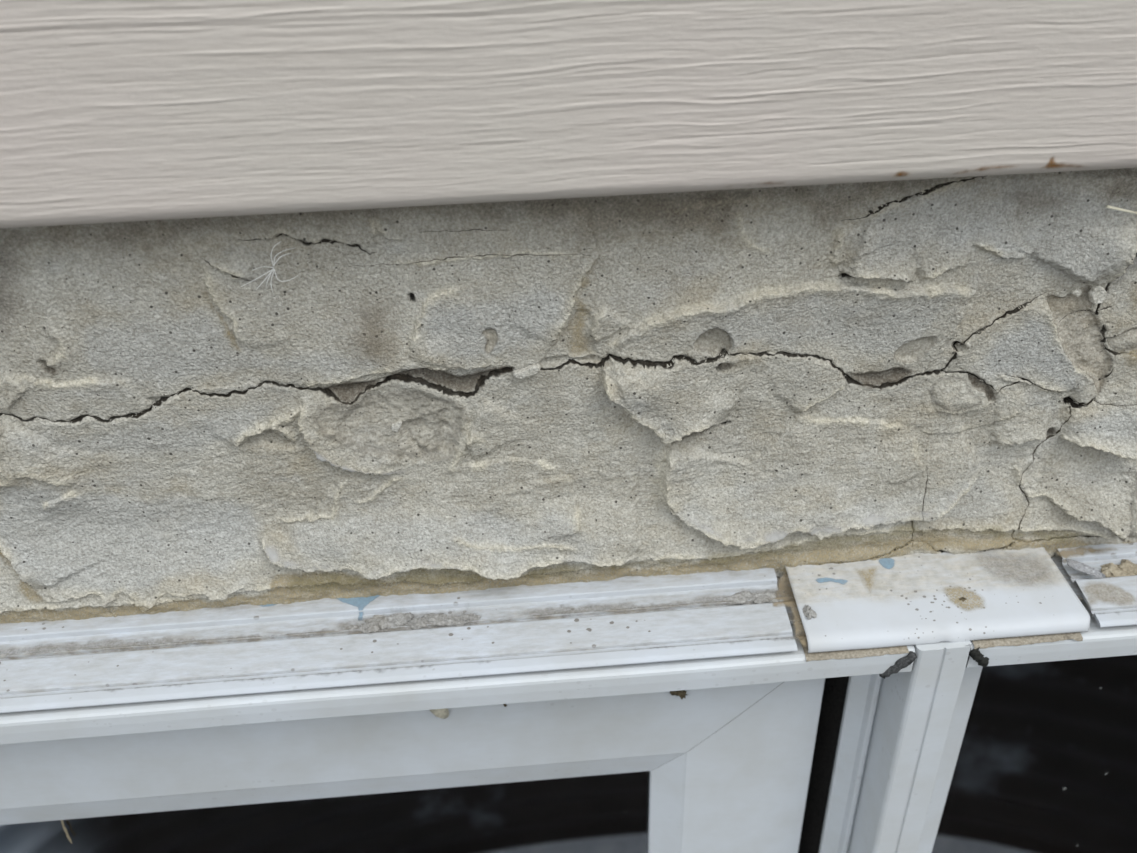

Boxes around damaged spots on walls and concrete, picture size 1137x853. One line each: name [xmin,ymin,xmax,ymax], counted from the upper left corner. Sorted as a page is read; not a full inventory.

crack [842,176,985,221]
crack [243,229,584,267]
crack [0,367,513,423]
spalling [316,392,463,461]
peeling [513,363,541,379]
crack [540,265,1137,551]
spalling [894,336,937,363]
spalling [1047,285,1112,393]
crack [806,474,947,565]